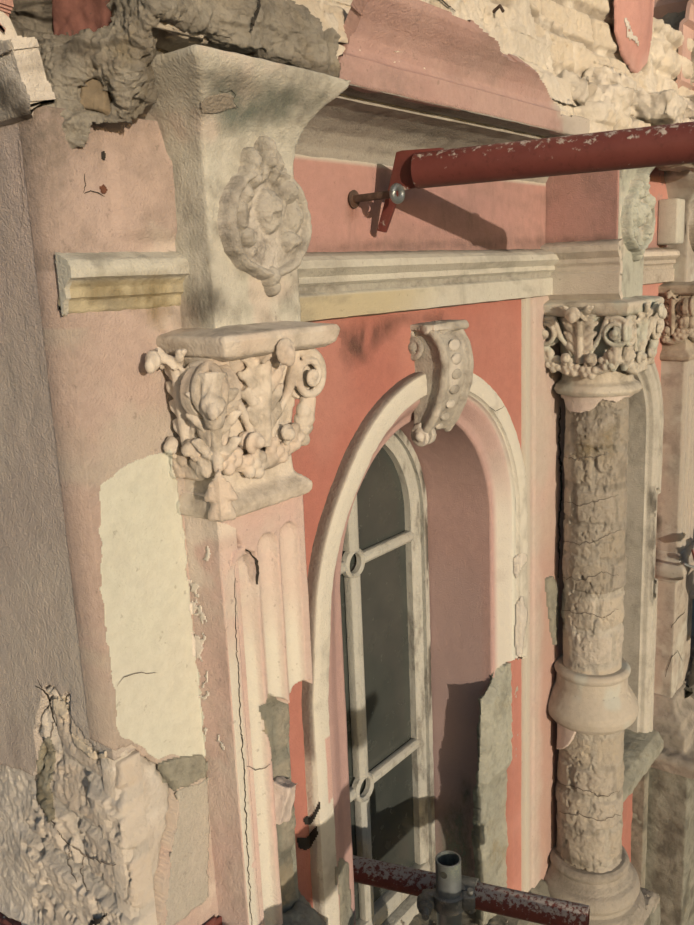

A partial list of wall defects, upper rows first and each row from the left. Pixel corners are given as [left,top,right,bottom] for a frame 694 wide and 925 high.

peeling [624,18,639,46]
crack [557,408,619,581]
crack [35,681,116,891]
spalling [0,685,208,925]
spalling [259,694,327,925]
spalling [335,858,354,925]
spalling [476,910,496,925]
spalling [471,596,528,888]